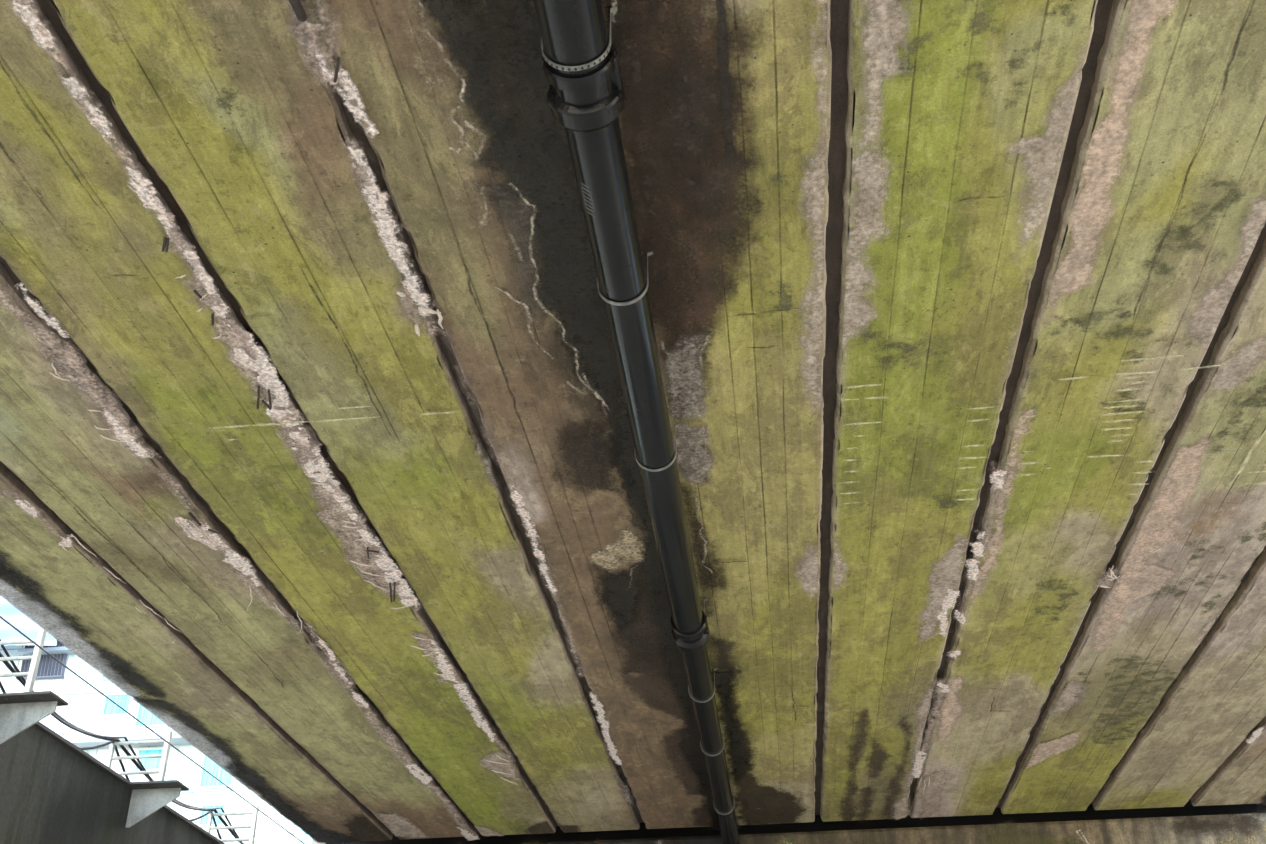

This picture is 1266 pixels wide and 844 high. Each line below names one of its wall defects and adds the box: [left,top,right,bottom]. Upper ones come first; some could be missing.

water stain [0,552,404,844]
spalling [0,0,420,610]
spalling [158,471,520,841]
spalling [288,0,447,337]
crack [459,254,524,430]
spalling [477,433,584,677]
water stain [407,0,720,831]
spalling [590,693,632,805]
water stain [602,0,763,616]
water stain [708,637,804,844]
water stain [841,710,912,823]
peeling [919,409,1037,642]